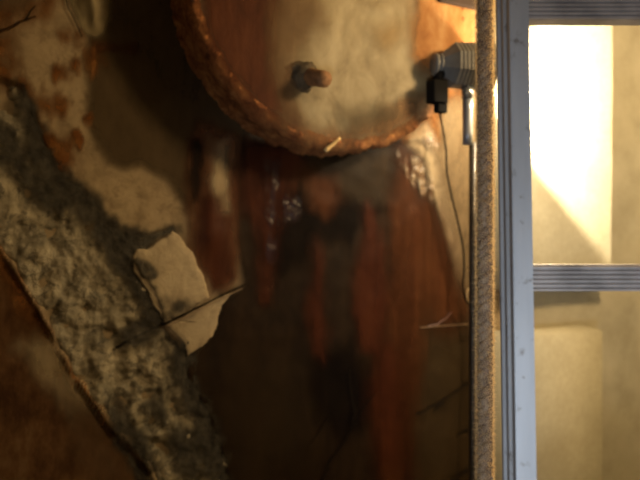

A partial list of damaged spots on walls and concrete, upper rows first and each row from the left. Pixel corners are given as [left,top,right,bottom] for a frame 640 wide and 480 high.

rust [170,0,442,158]
rust [448,88,462,104]
spalling [0,82,231,480]
crack [160,284,245,329]
rust [187,123,239,291]
leakage [88,0,469,480]